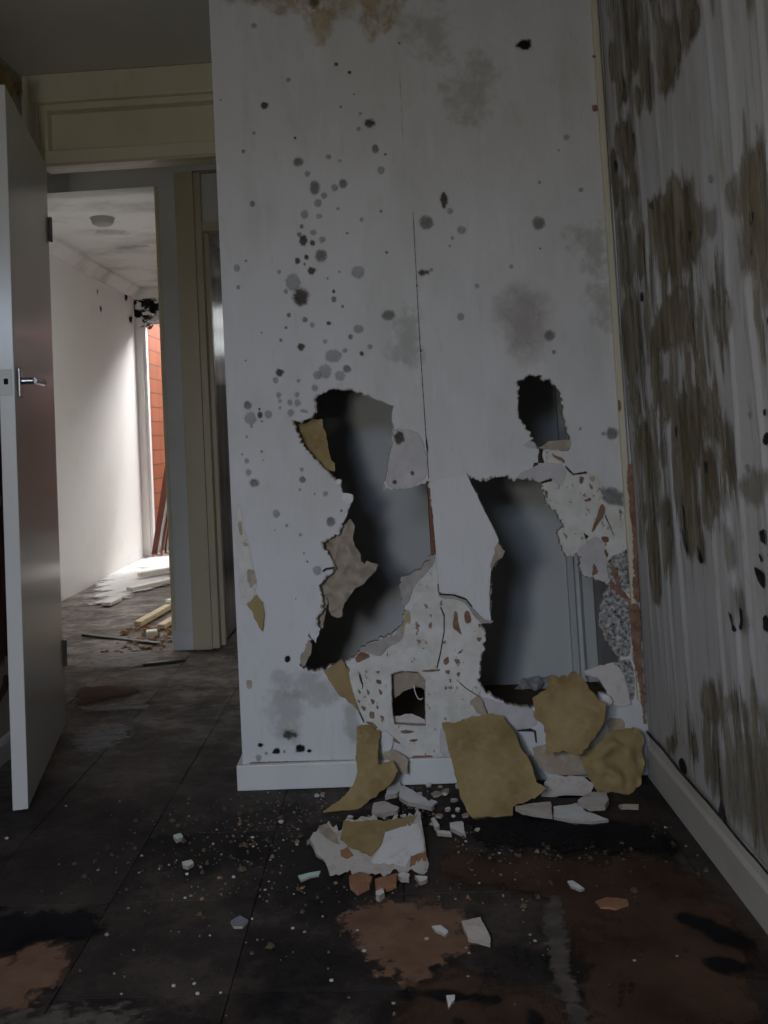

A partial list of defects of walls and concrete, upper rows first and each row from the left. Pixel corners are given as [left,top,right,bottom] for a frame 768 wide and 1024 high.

damp [515,39,531,50]
damp [295,224,326,274]
mould [279,289,308,342]
damp [606,0,768,606]
peeling [490,544,505,570]
peeling [517,450,642,701]
damp [728,590,746,632]
peeling [324,559,537,758]
damp [666,669,768,853]
spalling [417,783,469,819]
damp [0,906,106,952]
damp [398,989,502,1004]